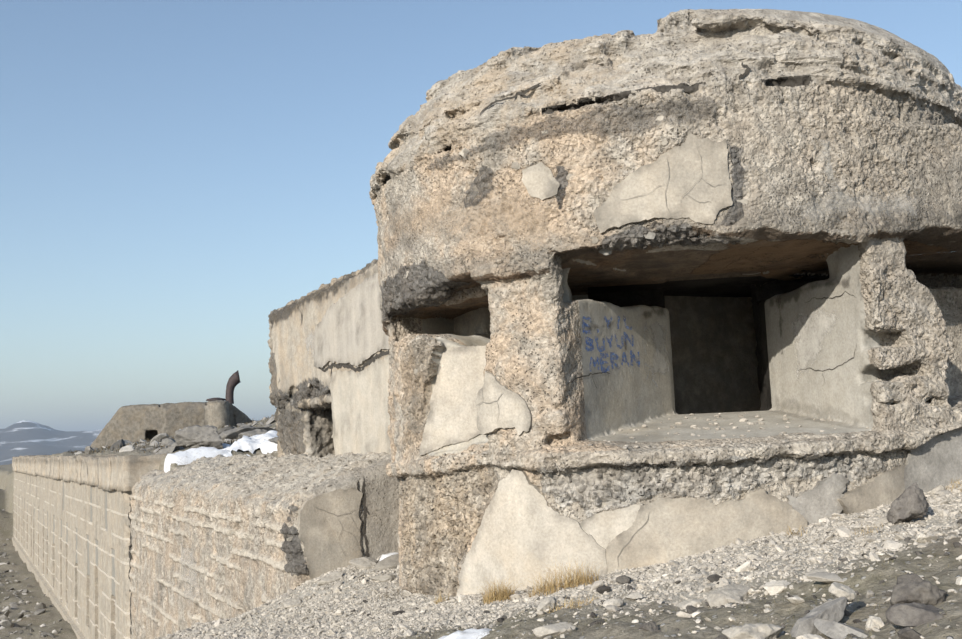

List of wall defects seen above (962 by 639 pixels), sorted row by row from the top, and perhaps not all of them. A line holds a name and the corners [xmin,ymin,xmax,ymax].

crack [739,62,812,87]
crack [480,82,706,115]
crack [320,350,389,374]
peeling [277,260,532,455]
crack [798,344,857,382]
crack [314,477,369,557]
peeling [398,428,962,598]
peeling [785,595,804,604]